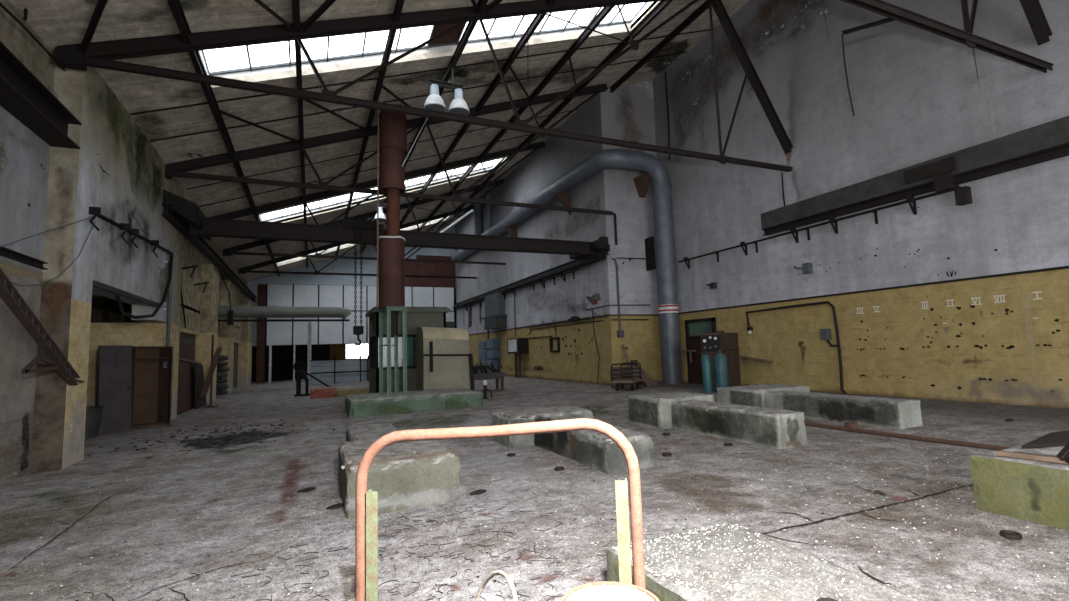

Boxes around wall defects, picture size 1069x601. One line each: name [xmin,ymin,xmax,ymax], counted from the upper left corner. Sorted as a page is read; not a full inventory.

crack [761,485,971,545]